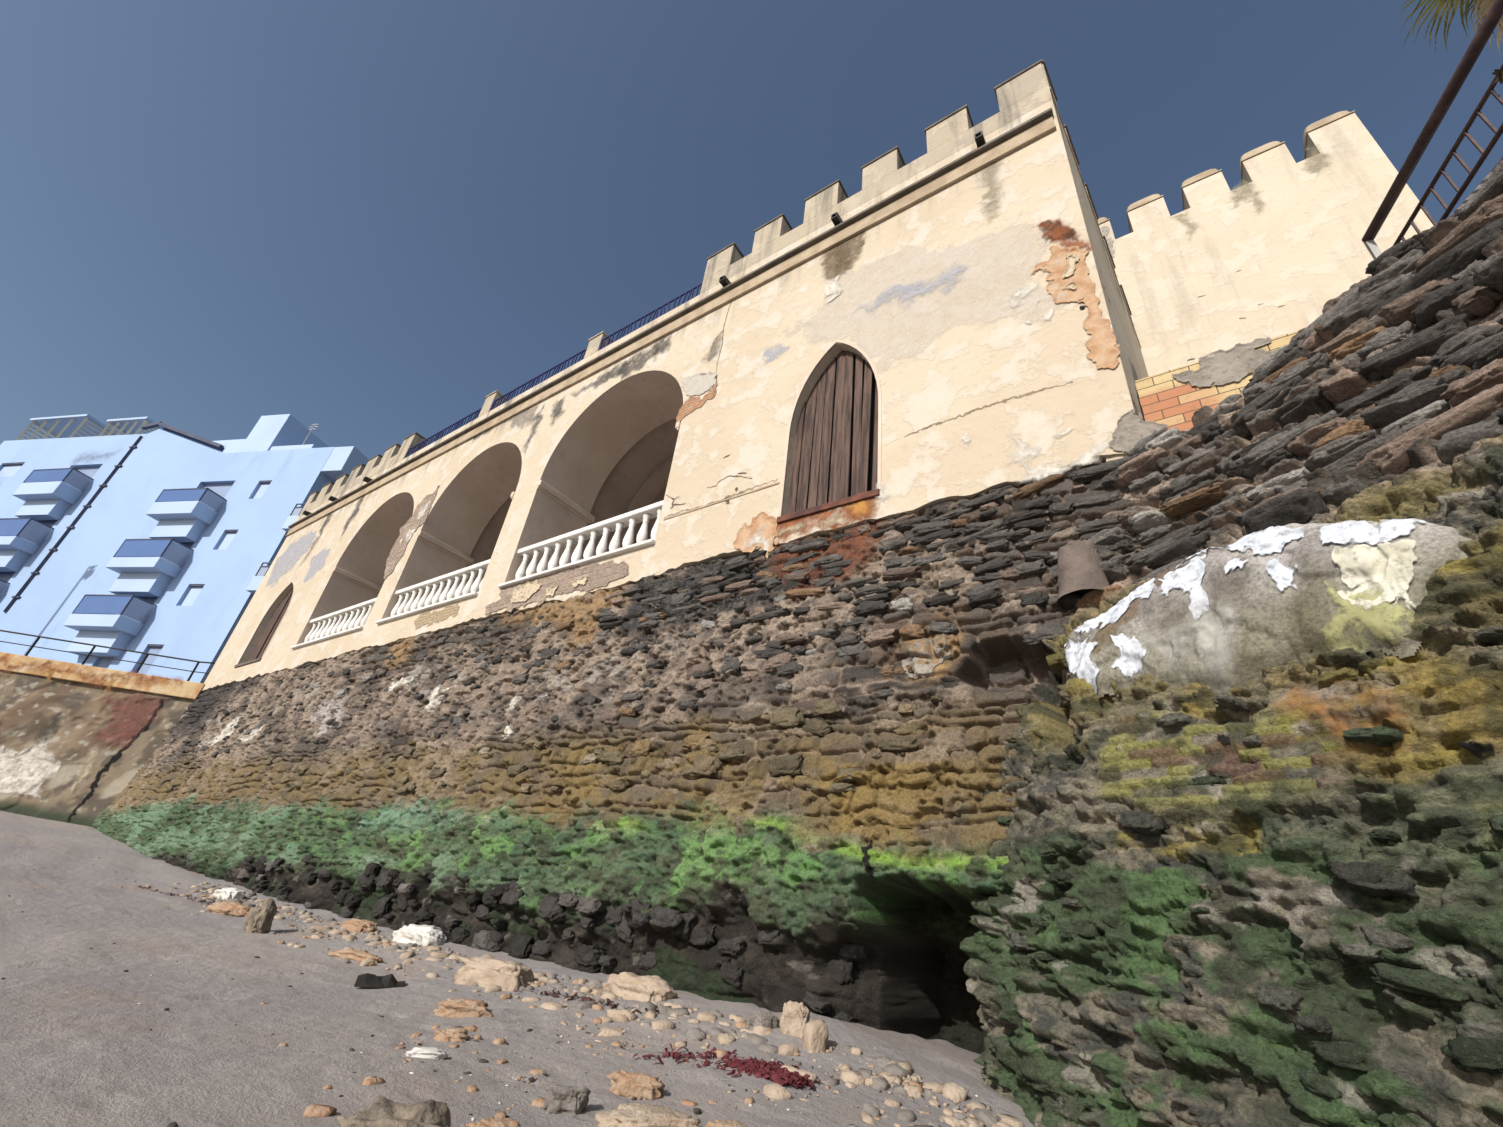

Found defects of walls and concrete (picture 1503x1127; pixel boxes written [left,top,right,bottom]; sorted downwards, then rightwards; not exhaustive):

leakage [822,232,865,279]
spalling [1031,245,1120,369]
spalling [1172,337,1276,387]
flaking render [676,371,718,423]
crack [905,381,1073,437]
spalling [733,512,780,558]